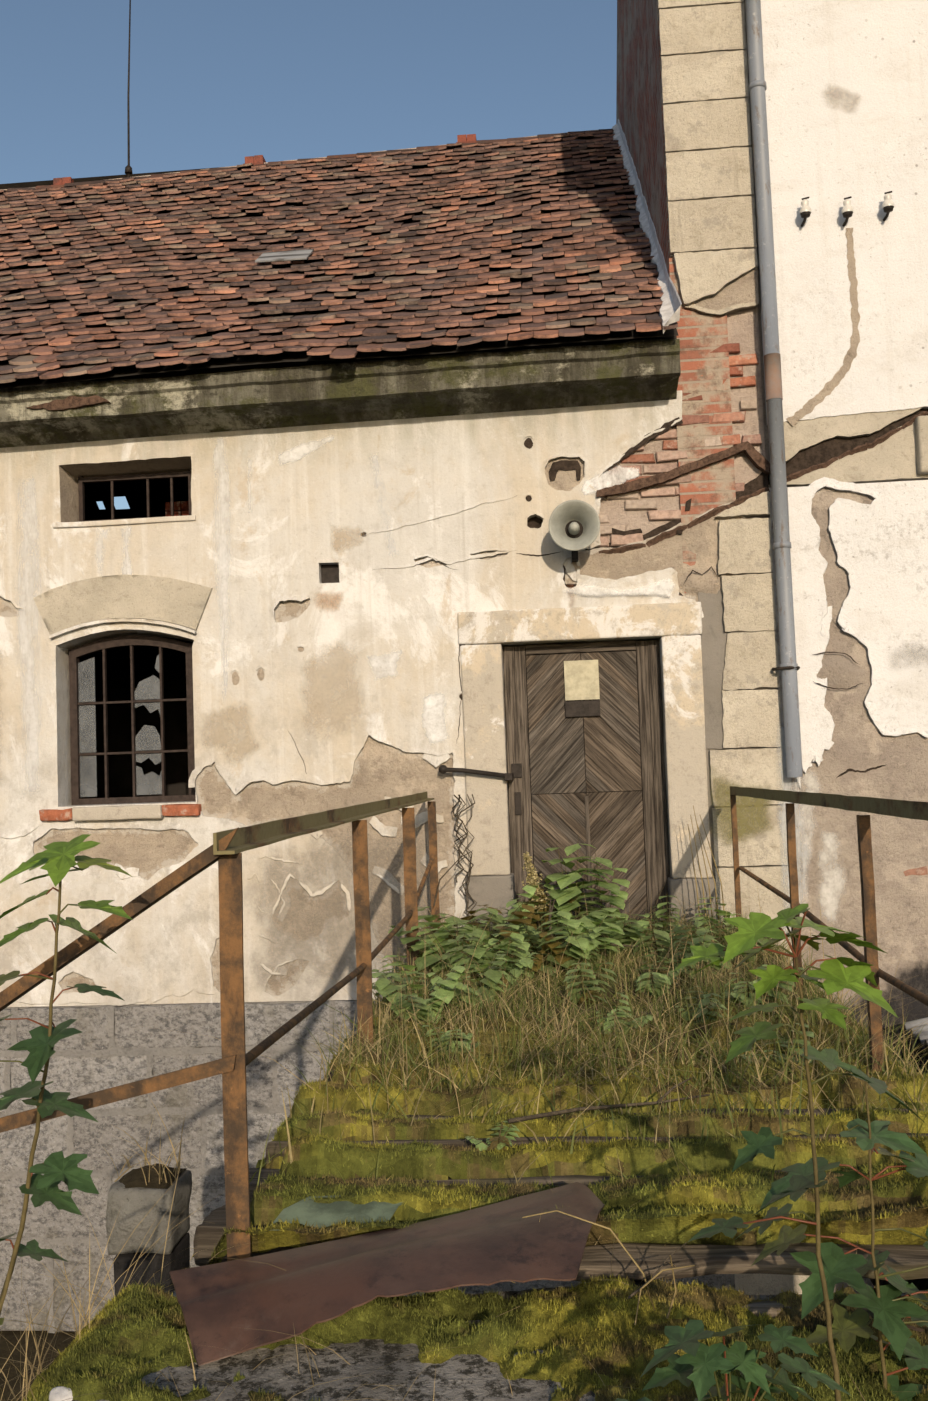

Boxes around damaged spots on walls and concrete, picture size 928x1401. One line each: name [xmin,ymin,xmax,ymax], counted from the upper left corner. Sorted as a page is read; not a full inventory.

spalling [522,434,535,449]
spalling [524,492,546,529]
crack [358,408,928,570]
flaking render [540,264,784,731]
peeling [0,586,28,617]
peeling [266,592,317,622]
peeling [783,477,928,1025]
peeling [0,728,463,1006]
leakage [847,965,928,1074]